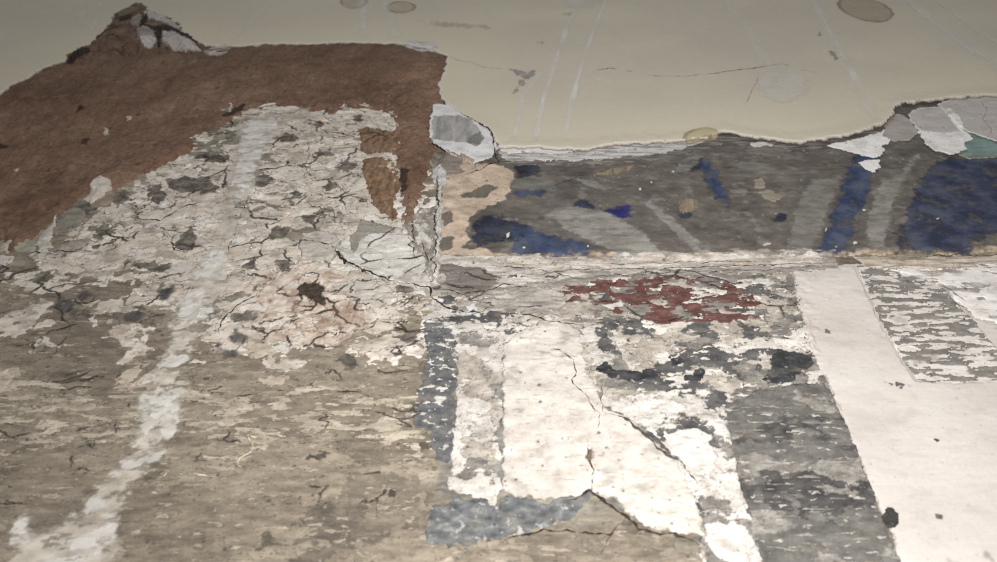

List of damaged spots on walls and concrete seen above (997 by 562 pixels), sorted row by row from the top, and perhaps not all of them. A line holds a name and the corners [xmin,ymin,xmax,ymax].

leakage [837,0,893,22]
crack [0,106,822,392]
peeling [428,97,997,383]
peeling [0,298,63,338]
peeling [101,315,156,366]
peeling [115,365,171,392]
crack [377,405,423,444]
crack [310,450,330,503]
crack [359,471,386,518]
peeling [425,491,591,549]
crack [500,349,699,555]
peeling [882,507,899,529]